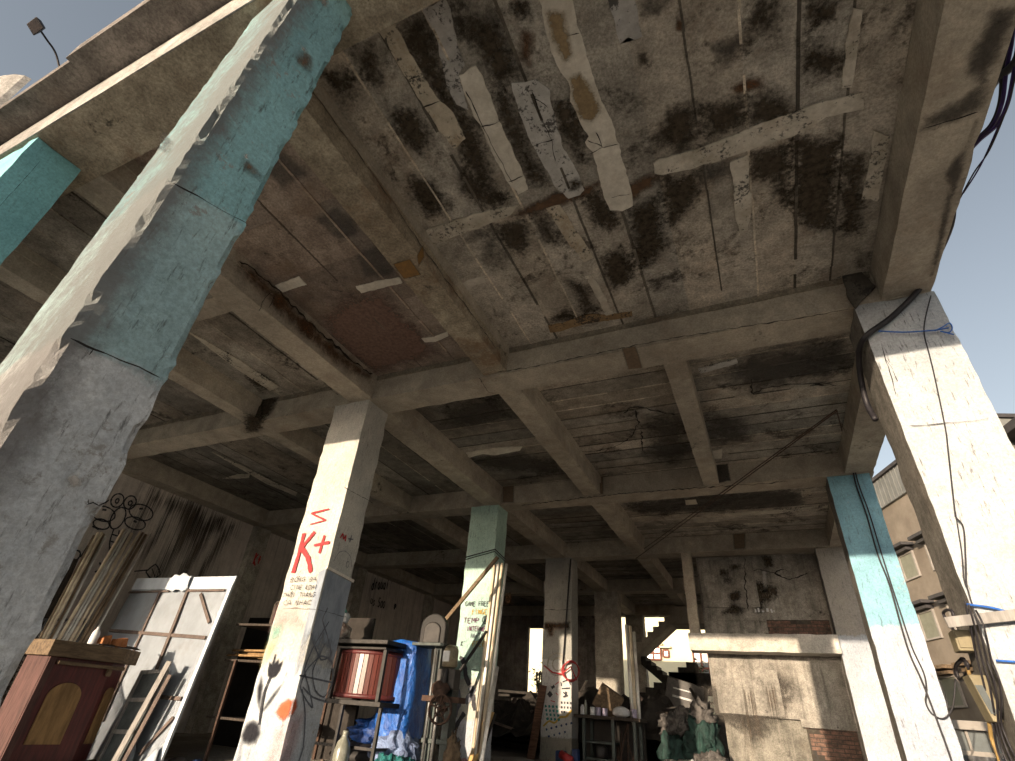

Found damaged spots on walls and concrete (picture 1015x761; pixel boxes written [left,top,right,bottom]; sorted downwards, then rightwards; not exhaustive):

damp [802,0,845,78]
damp [390,106,432,157]
damp [402,12,512,207]
damp [457,0,552,187]
damp [553,100,594,164]
damp [660,87,795,154]
damp [406,174,453,217]
damp [580,166,726,292]
damp [746,134,868,235]
rust [238,265,370,378]
crack [582,406,685,456]
crack [744,559,807,610]